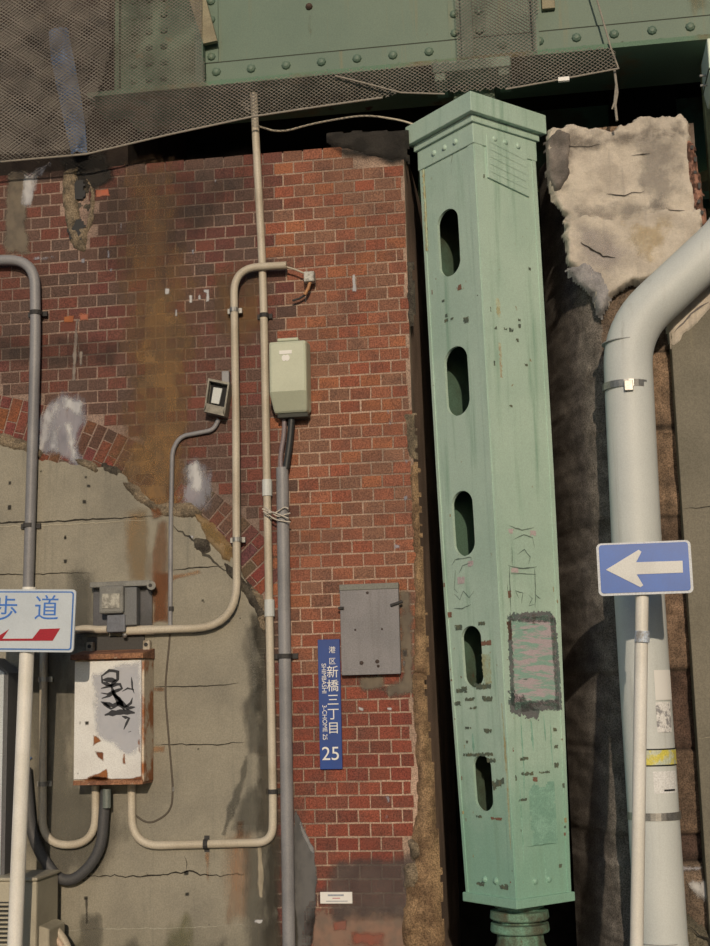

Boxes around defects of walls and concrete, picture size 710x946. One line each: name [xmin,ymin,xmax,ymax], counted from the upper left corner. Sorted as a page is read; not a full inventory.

spalling [62,167,109,252]
damp [122,279,210,507]
spalling [0,433,44,458]
damp [39,396,85,464]
spalling [75,458,266,631]
peeling [454,683,493,709]
rust [88,736,109,781]
peeling [520,757,559,782]
crack [87,856,248,878]